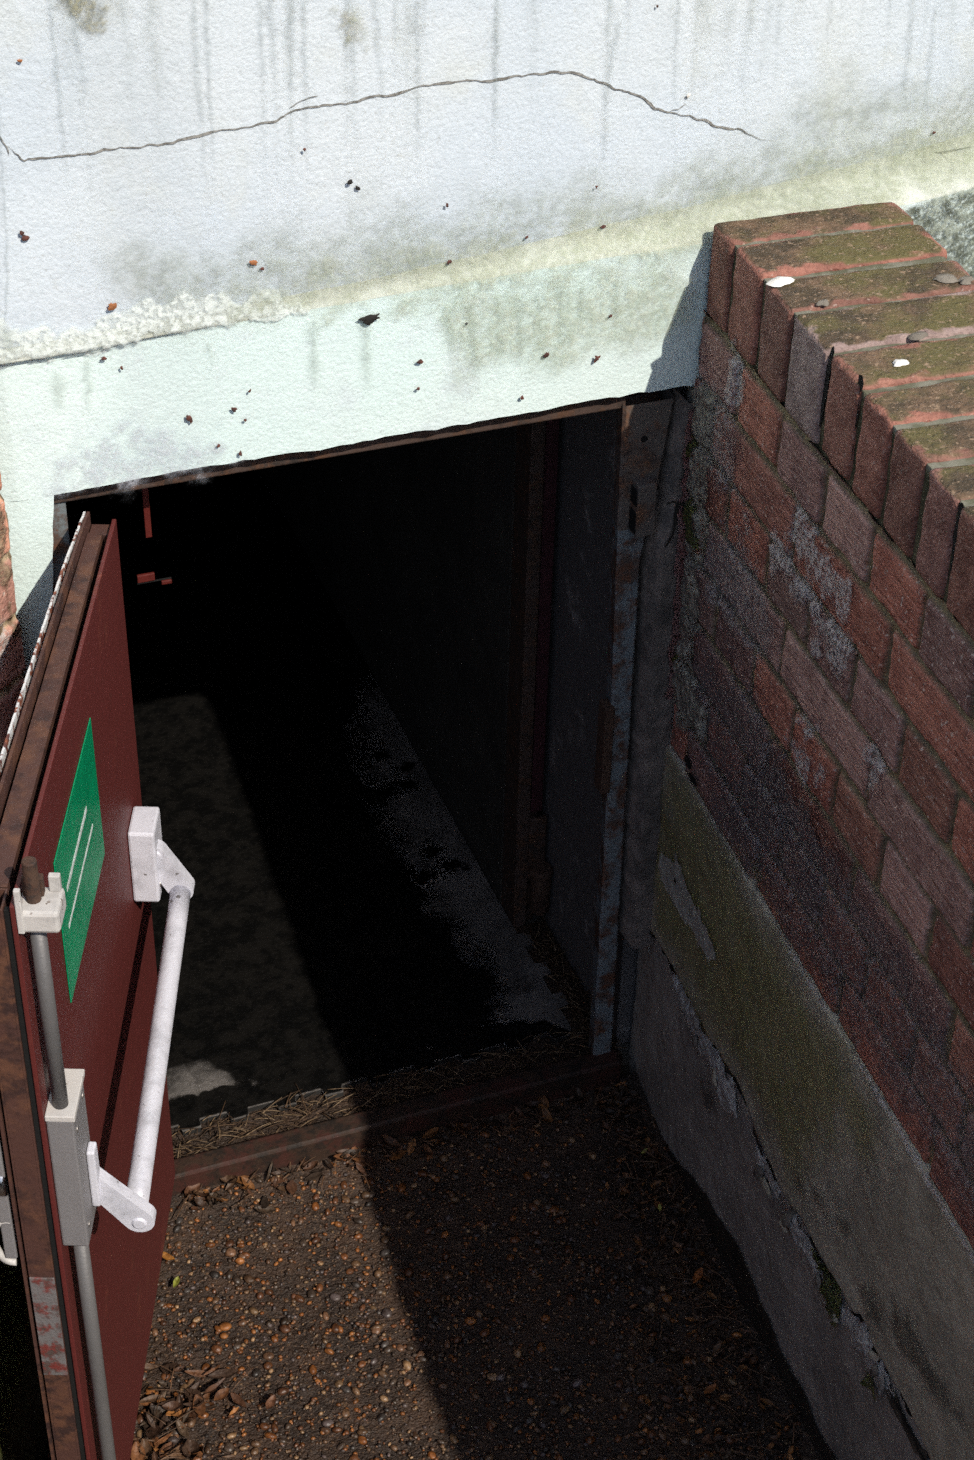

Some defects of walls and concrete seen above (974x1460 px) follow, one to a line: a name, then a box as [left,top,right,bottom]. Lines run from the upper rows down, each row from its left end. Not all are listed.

crack [0,70,772,162]
crack [650,932,930,1460]
water stain [689,667,974,1210]